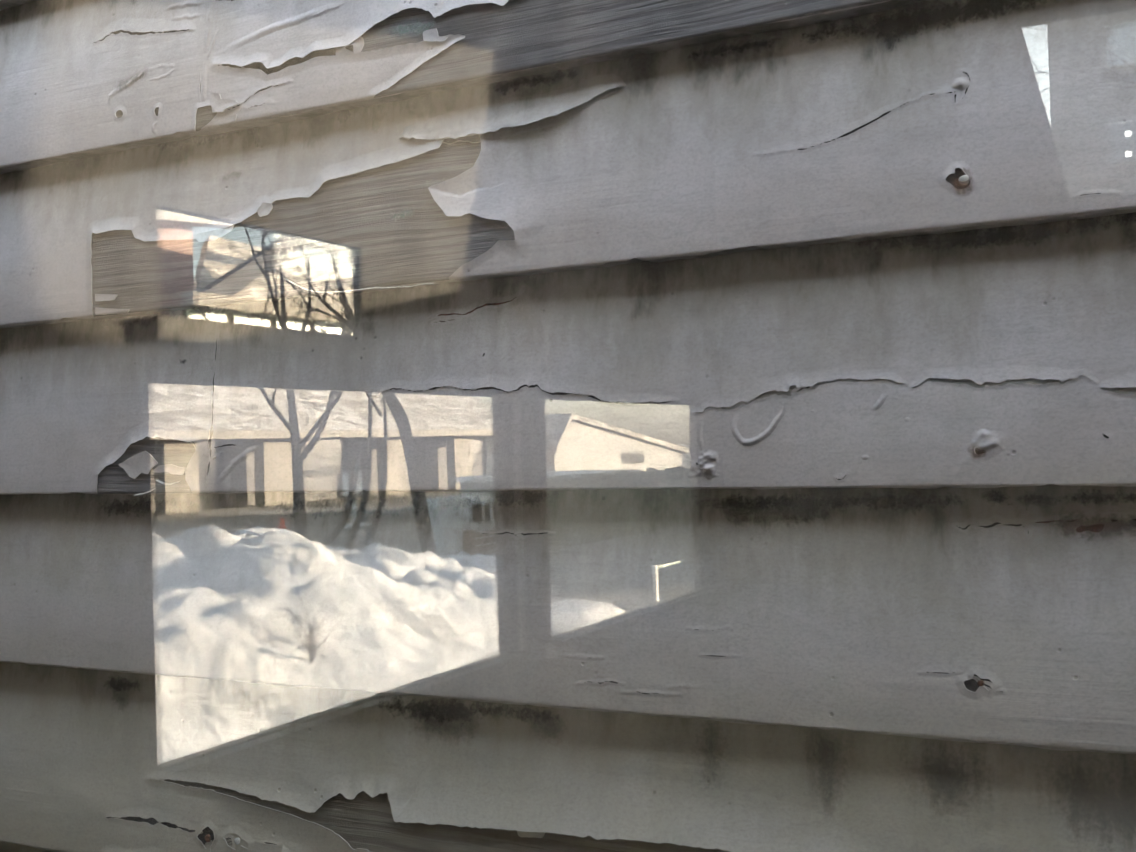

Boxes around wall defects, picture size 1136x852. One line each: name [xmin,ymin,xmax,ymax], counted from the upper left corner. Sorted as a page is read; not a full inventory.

peeling [191,0,888,132]
peeling [84,74,627,317]
water stain [877,212,1136,247]
water stain [102,307,225,325]
crack [365,364,1136,416]
peeling [91,419,242,496]
water stain [104,500,199,515]
water stain [276,490,545,518]
peeling [917,665,1008,700]
water stain [381,700,550,722]
peeling [144,769,894,852]